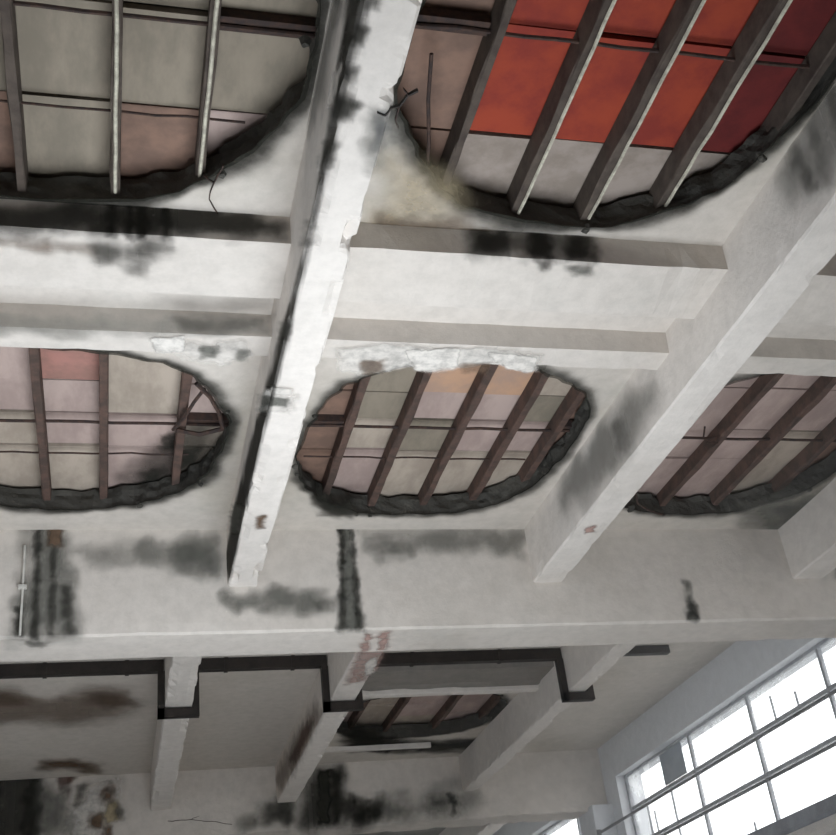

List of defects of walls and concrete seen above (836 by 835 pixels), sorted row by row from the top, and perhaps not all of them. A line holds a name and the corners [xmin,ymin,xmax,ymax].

hole [0,0,330,208]
spalling [390,0,836,234]
damp [0,203,284,262]
spalling [0,336,249,514]
damp [316,489,359,517]
spalling [292,344,595,517]
hole [623,373,836,517]
damp [15,529,73,646]
damp [336,529,363,632]
spalling [336,694,509,739]
damp [0,778,63,835]
damp [245,765,402,830]